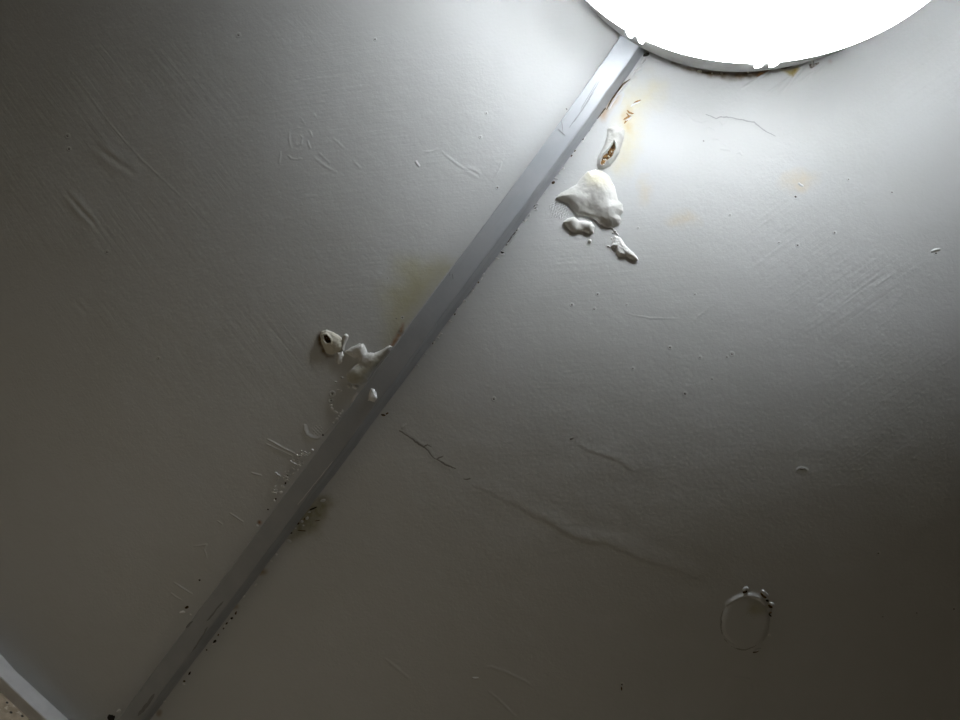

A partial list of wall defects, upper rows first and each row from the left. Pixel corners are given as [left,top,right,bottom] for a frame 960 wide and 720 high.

crack [381,412,471,480]